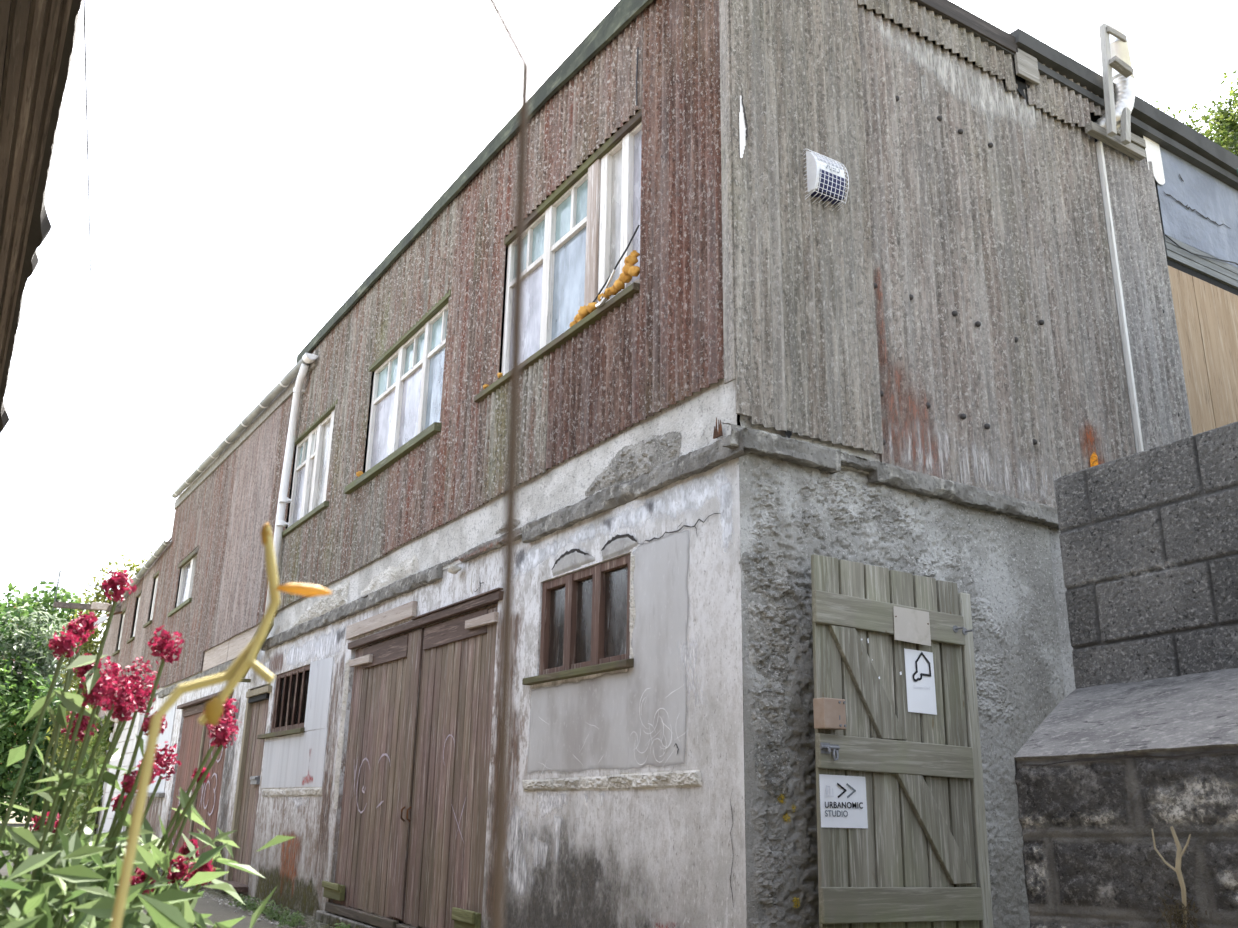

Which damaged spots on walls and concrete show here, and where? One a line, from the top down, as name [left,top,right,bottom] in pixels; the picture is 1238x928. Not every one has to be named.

rust [876,271,942,475]
spalling [585,431,681,497]
rust [1084,427,1104,467]
spalling [290,555,419,629]
water stain [486,614,649,928]
rust [280,832,300,895]